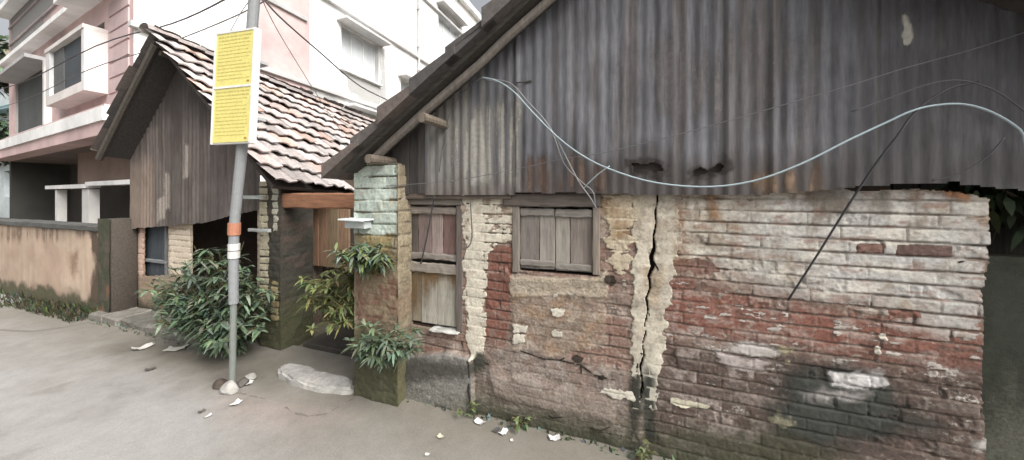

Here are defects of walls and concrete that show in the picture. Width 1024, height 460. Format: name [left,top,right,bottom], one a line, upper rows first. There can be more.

flaking render [461,199,512,362]
crack [520,195,659,389]
peeling [602,188,991,414]
water stain [405,353,487,380]
water stain [670,397,710,409]
water stain [715,341,779,371]
water stain [772,366,946,447]